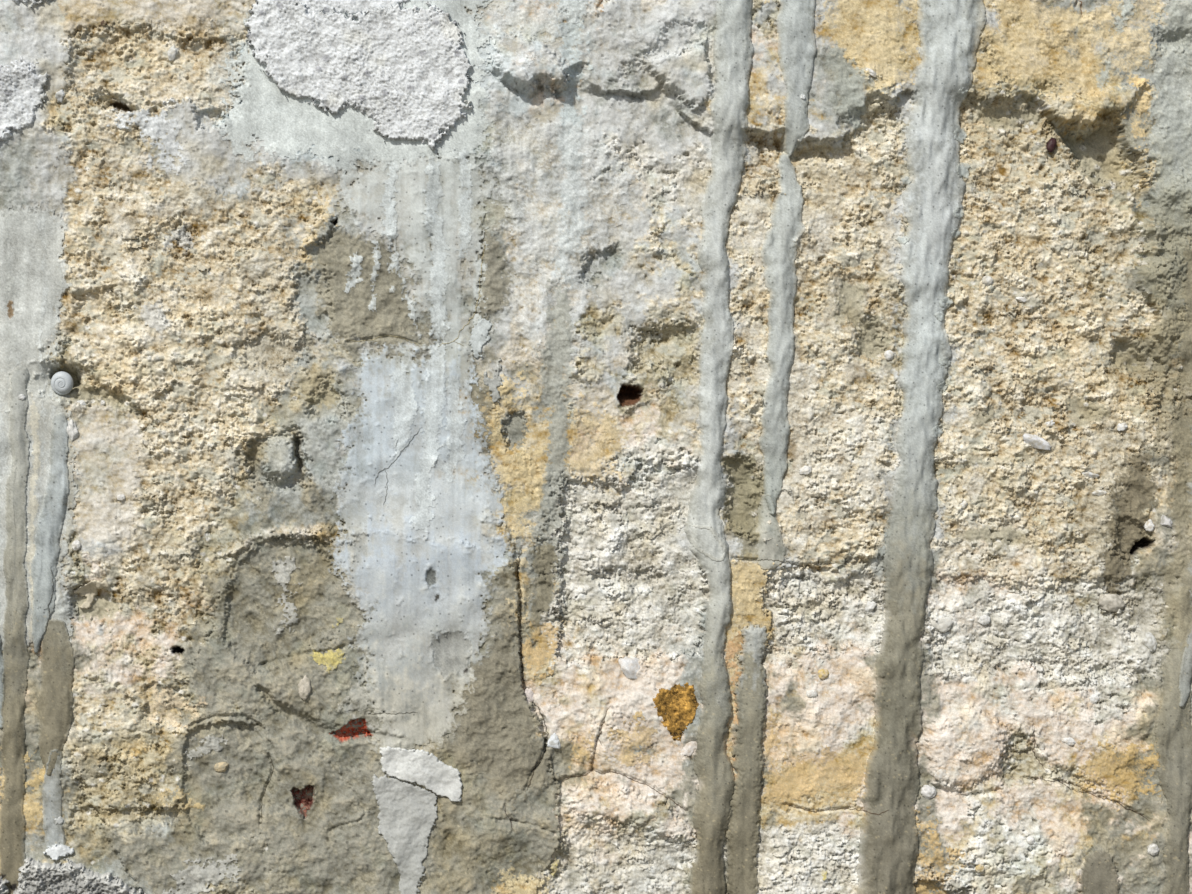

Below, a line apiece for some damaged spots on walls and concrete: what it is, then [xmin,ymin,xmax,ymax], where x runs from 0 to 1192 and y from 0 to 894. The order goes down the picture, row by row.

leakage [0,200,86,651]
spalling [0,0,473,638]
leakage [216,0,642,815]
crack [517,550,549,789]
crack [563,709,687,811]
leakage [718,452,772,563]
leakage [1095,0,1192,652]